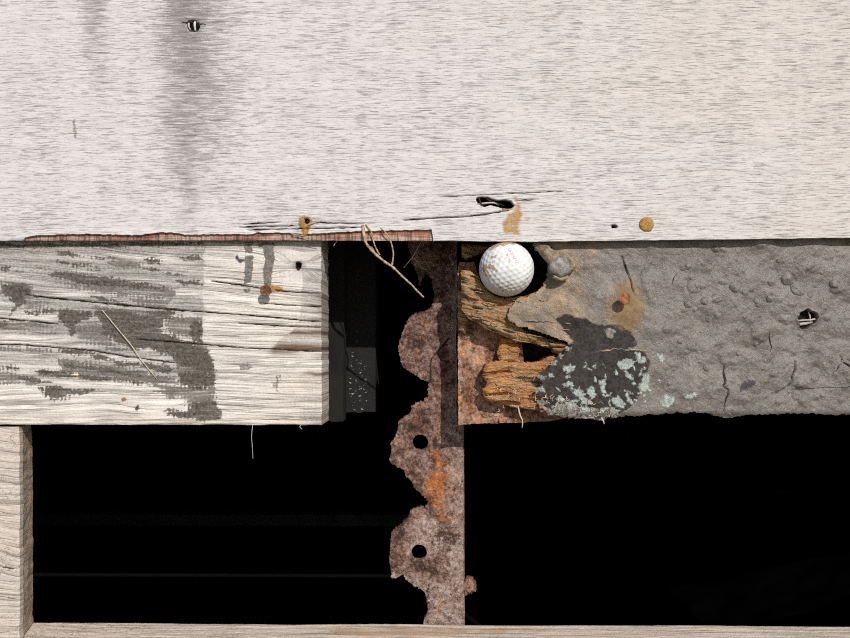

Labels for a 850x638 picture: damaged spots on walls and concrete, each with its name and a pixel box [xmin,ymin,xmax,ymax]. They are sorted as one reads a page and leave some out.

crack [405,191,562,221]
corrosion [503,200,521,234]
crack [722,367,730,411]
crack [775,359,850,393]